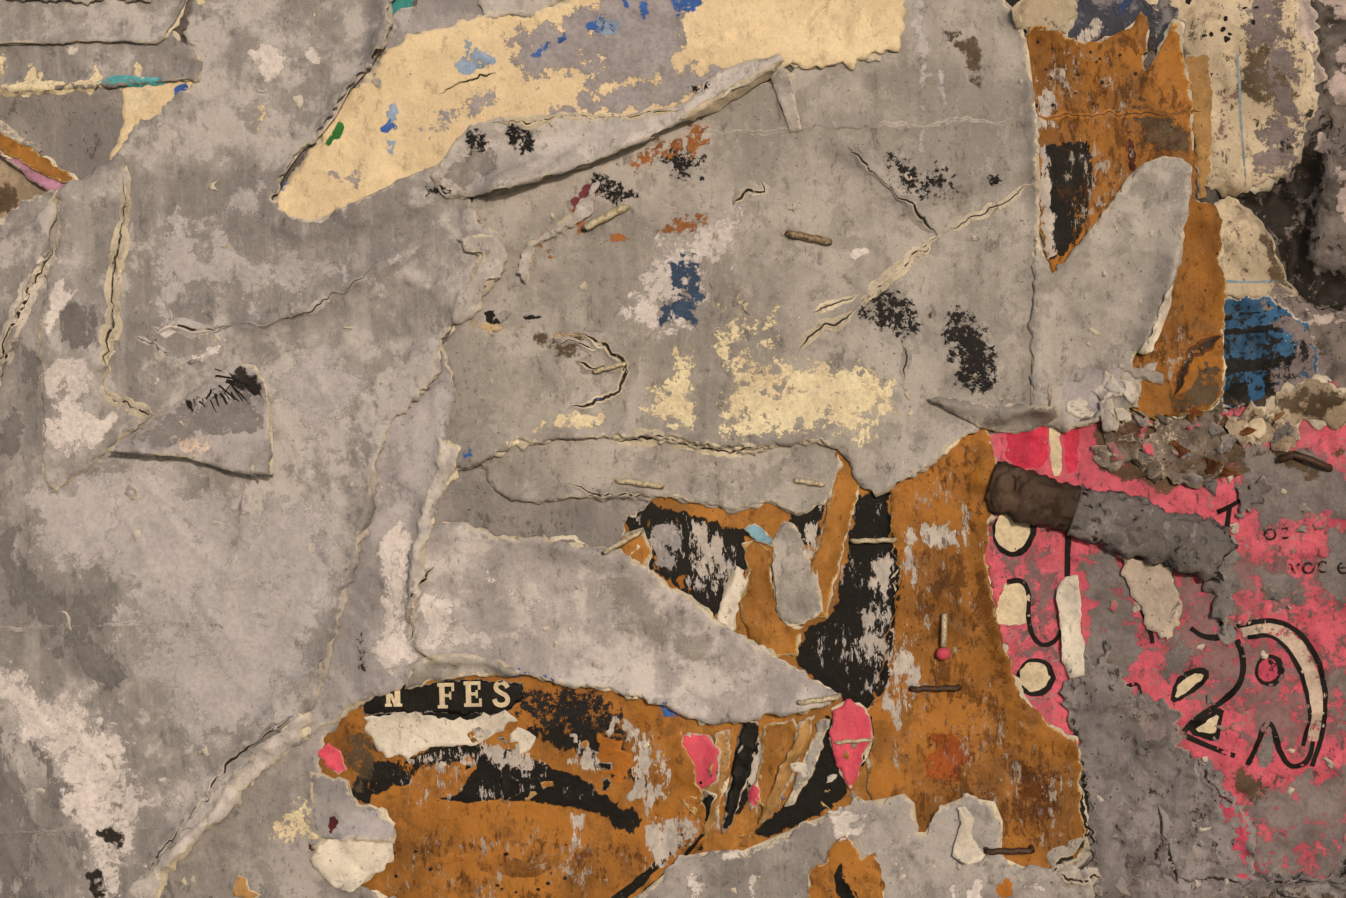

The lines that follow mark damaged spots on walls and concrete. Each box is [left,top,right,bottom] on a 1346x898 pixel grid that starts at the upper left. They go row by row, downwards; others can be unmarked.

crack [99,174,373,419]
crack [554,331,780,458]
crack [492,107,1202,351]
crack [0,715,294,885]